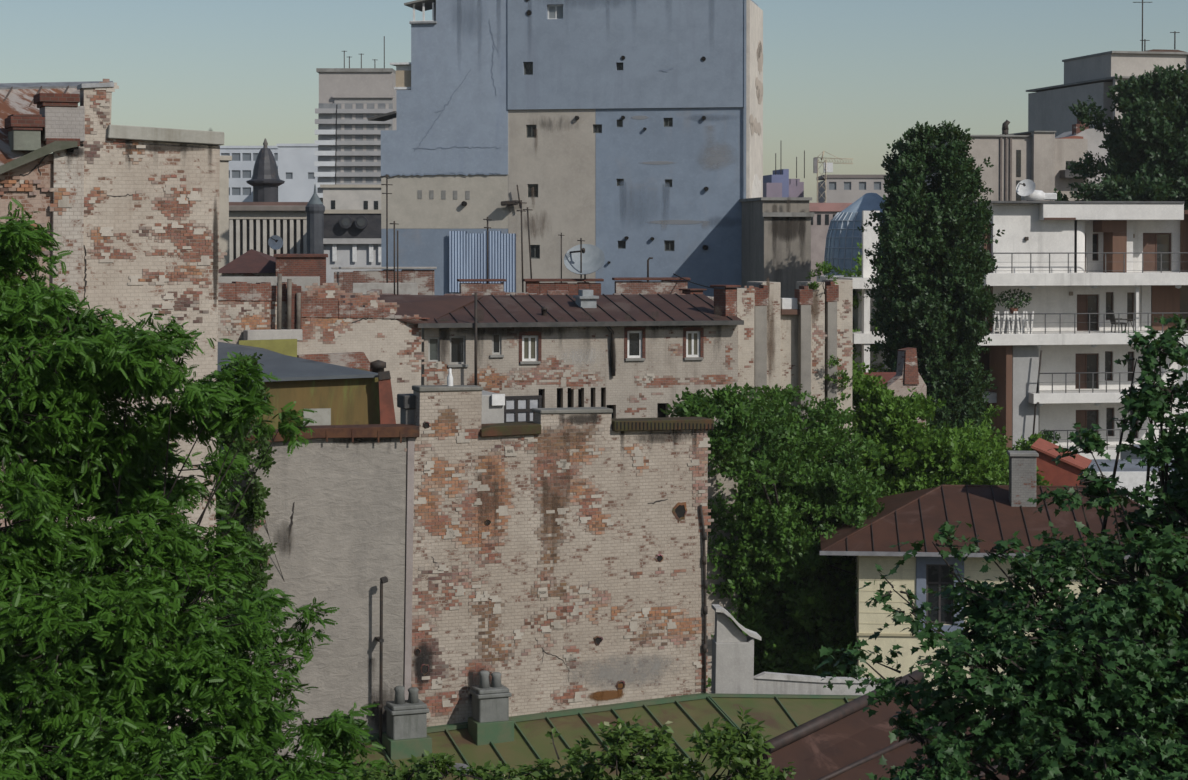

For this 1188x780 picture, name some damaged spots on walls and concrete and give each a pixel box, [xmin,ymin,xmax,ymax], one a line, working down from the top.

crack [381,19,501,177]
flaking render [0,175,287,336]
flaking render [299,283,450,385]
flaking render [467,355,603,393]
flaking render [625,346,754,415]
flaking render [812,302,853,380]
flaking render [404,405,714,719]